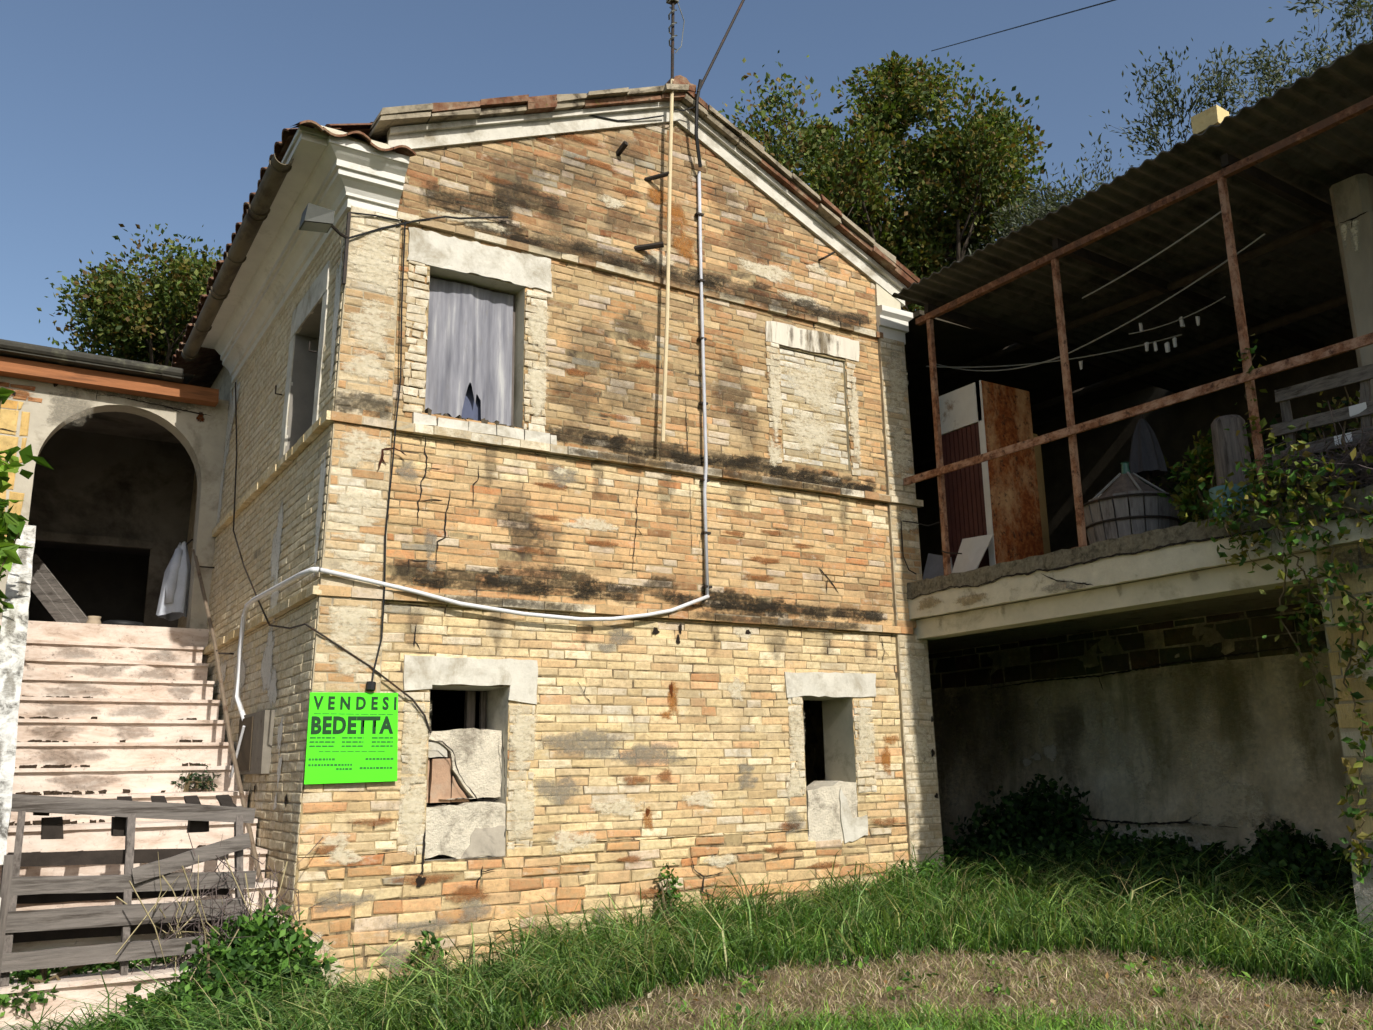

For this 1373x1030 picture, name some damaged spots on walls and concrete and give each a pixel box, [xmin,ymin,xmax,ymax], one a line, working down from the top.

leakage [422,183,873,329]
crack [377,437,479,570]
leakage [549,427,874,494]
leakage [387,562,883,629]
leakage [932,612,1326,798]